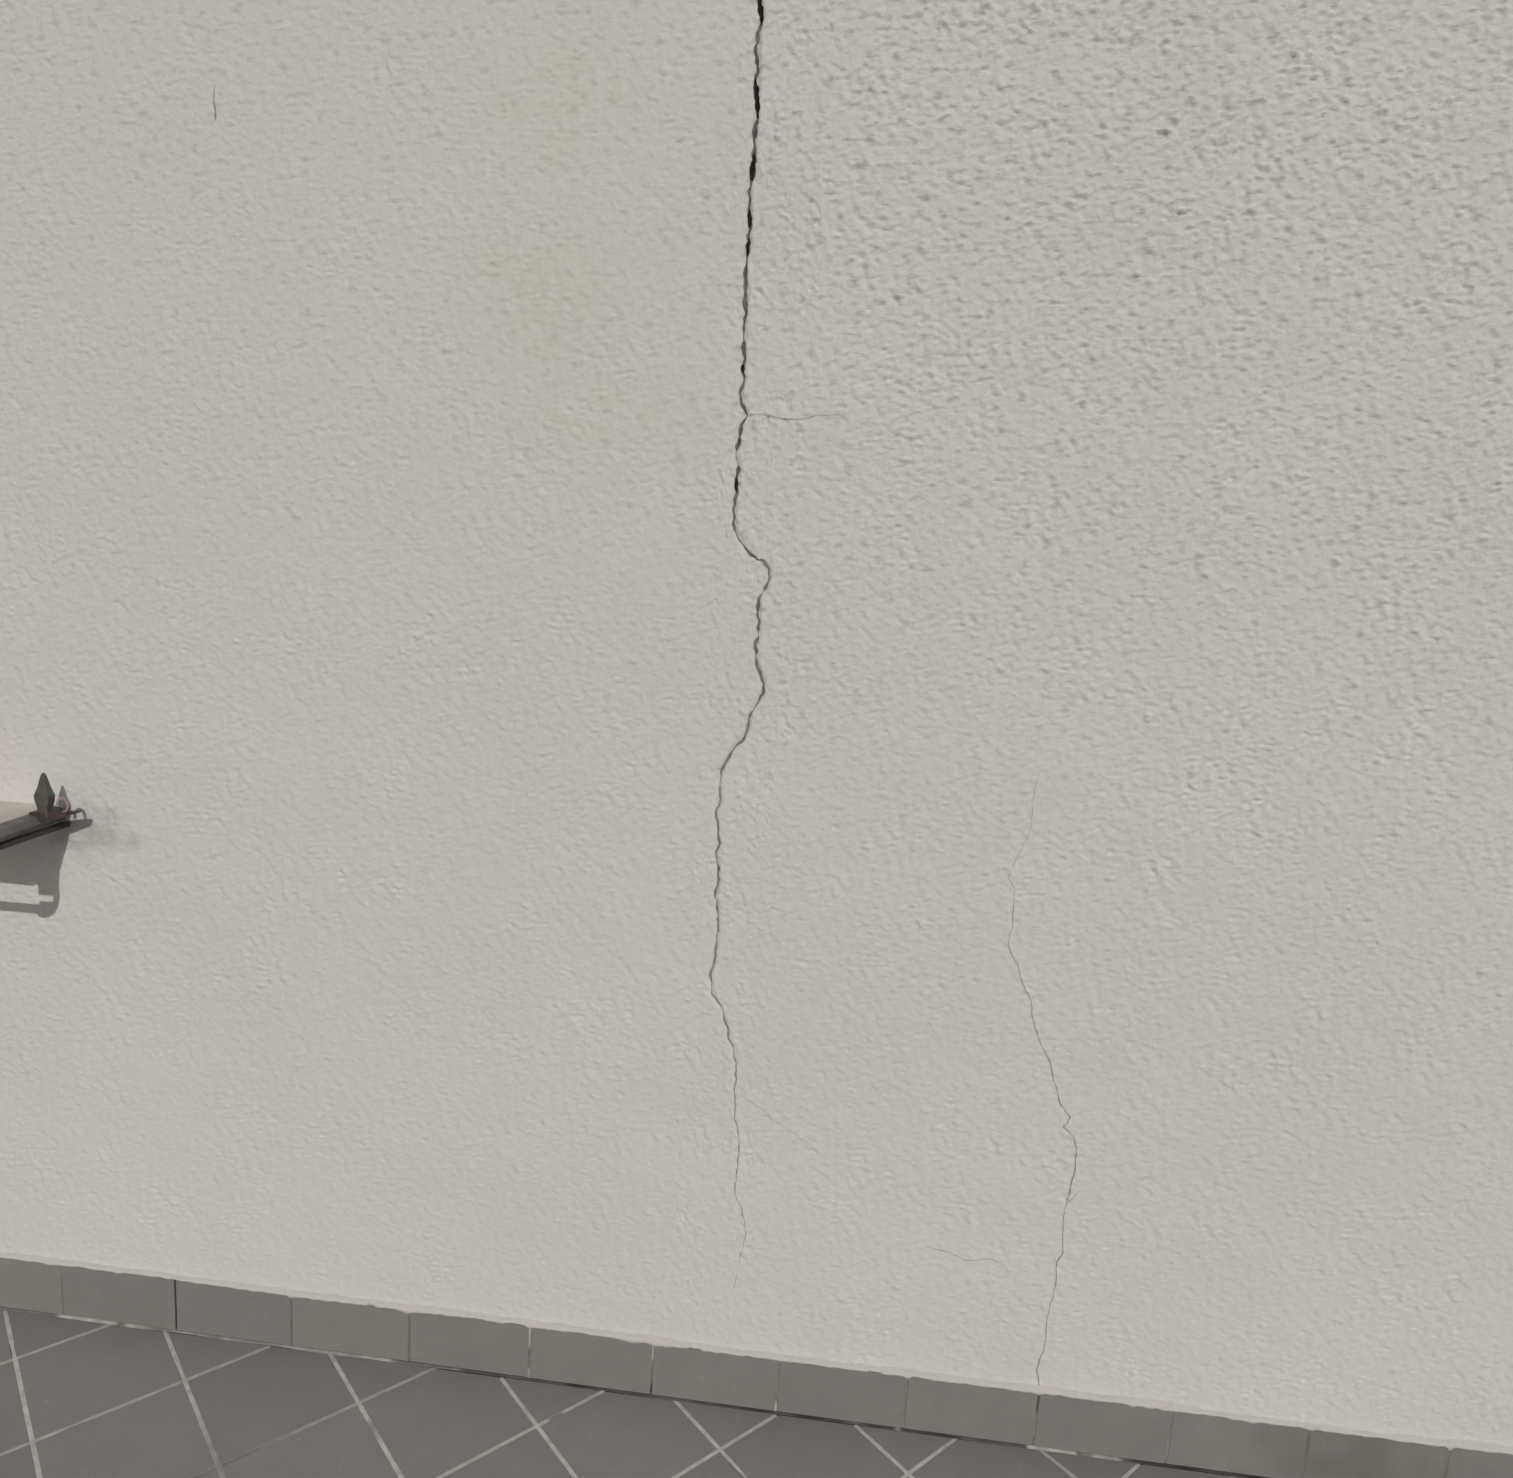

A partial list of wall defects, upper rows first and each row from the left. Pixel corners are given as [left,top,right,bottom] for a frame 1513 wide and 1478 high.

crack [709,0,841,1287]
crack [1008,772,1081,1385]